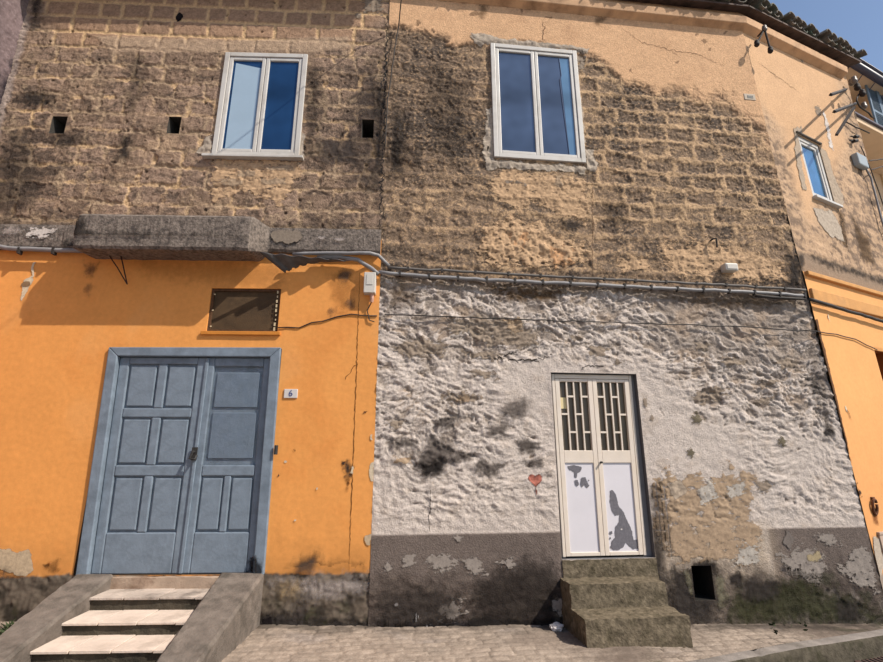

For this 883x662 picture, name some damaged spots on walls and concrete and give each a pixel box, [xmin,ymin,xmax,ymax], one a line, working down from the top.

damp [374,88,419,183]
peeling [20,262,36,301]
crack [479,352,552,364]
peeling [816,315,852,463]
damp [491,398,526,435]
damp [388,417,505,476]
damp [516,439,542,467]
flaking render [650,459,774,567]
peeling [0,548,33,577]
peeling [384,553,489,576]
peeling [775,530,883,595]
damp [468,617,553,627]